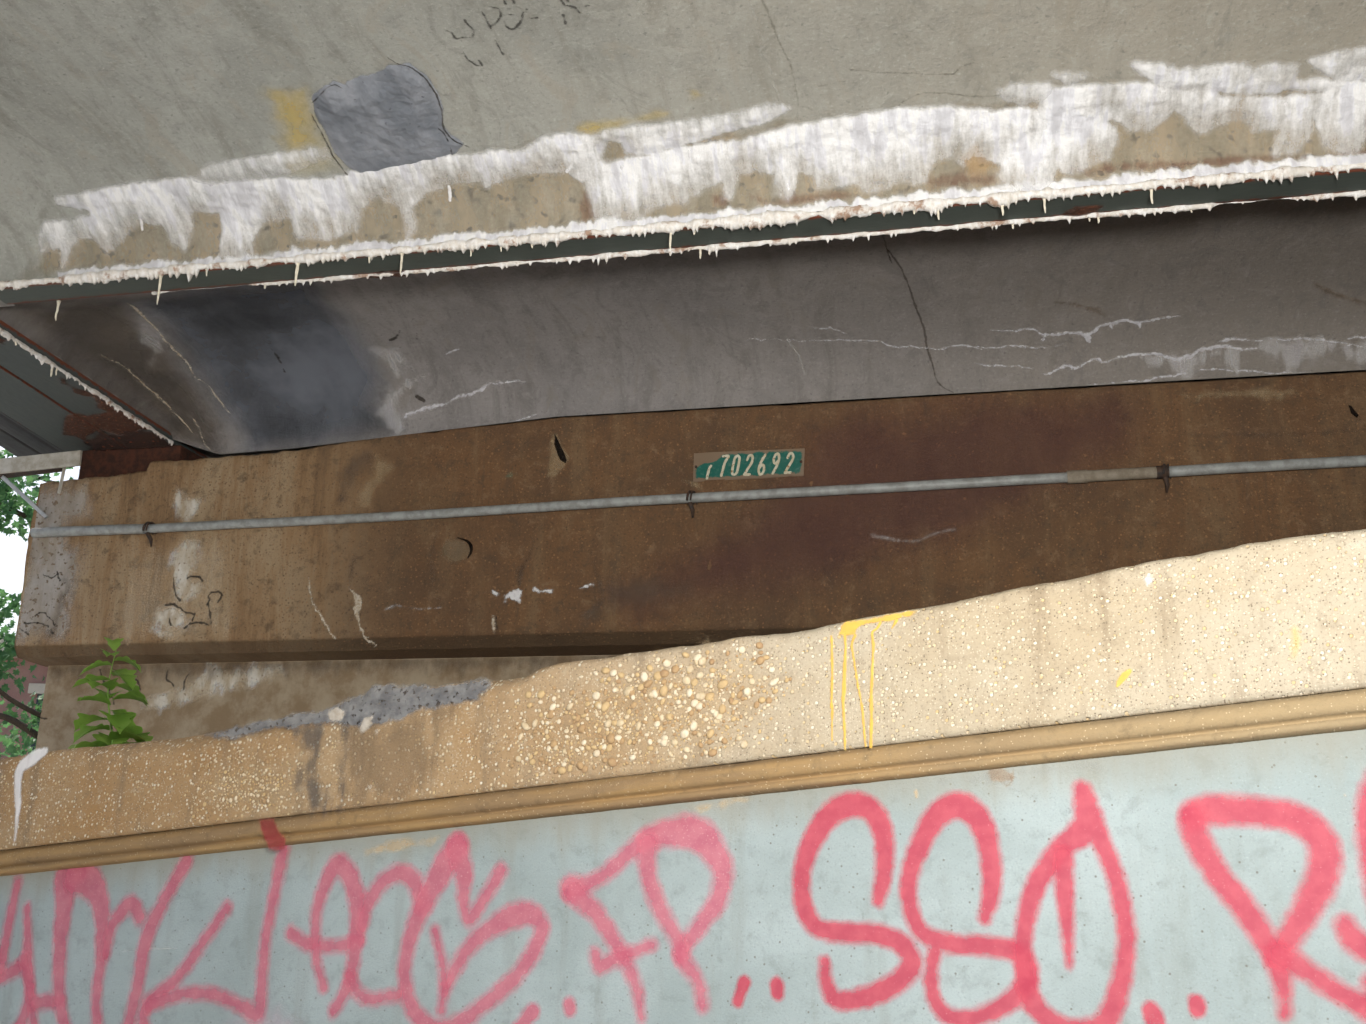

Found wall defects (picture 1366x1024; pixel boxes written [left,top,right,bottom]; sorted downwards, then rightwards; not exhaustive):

damp [0,48,1366,446]
corrosion [60,379,176,451]
peeling [149,665,280,707]
spalling [186,680,490,819]
spalling [506,642,794,777]